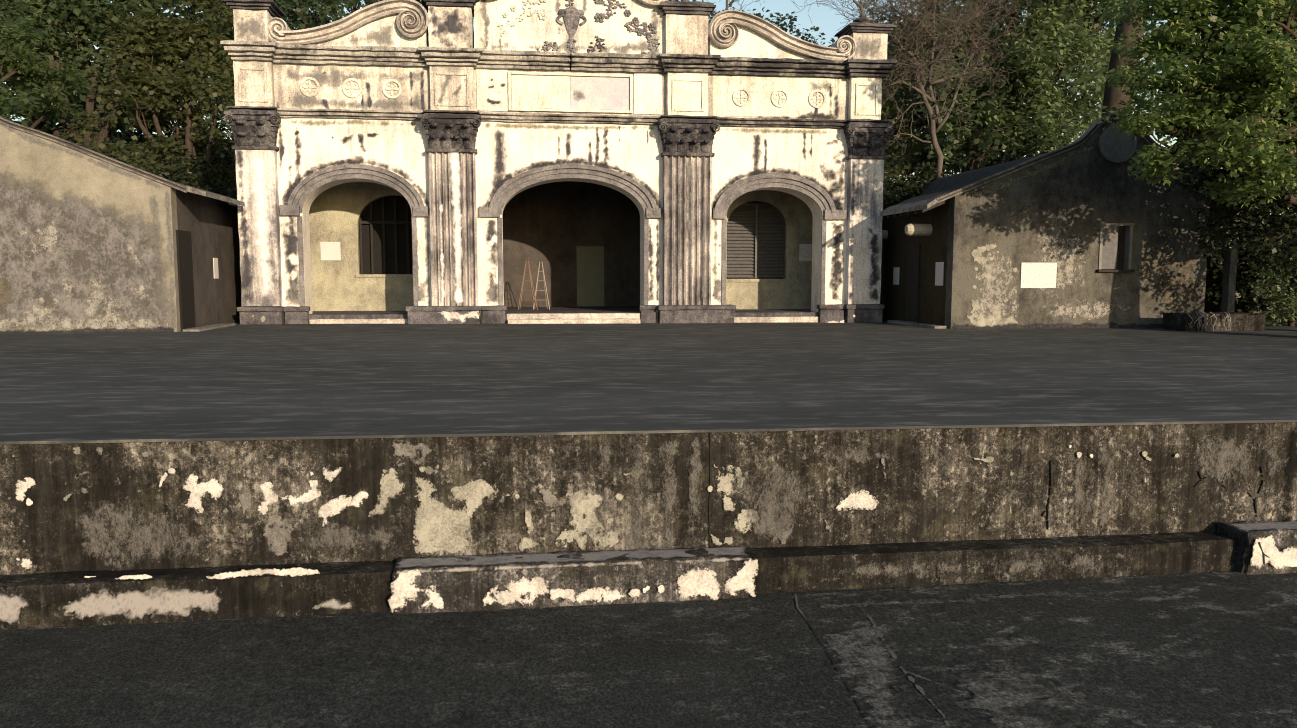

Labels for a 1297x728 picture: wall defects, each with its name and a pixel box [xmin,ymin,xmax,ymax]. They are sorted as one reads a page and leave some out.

water stain [277,67,461,305]
water stain [688,83,880,301]
water stain [76,504,203,567]
peeling [159,468,223,515]
peeling [206,441,538,613]
water stain [495,438,702,570]
peeling [482,559,759,606]
peeling [708,465,758,545]
water stain [739,472,803,536]
peeling [824,490,878,532]
water stain [1197,439,1251,484]
peeling [1251,535,1297,569]